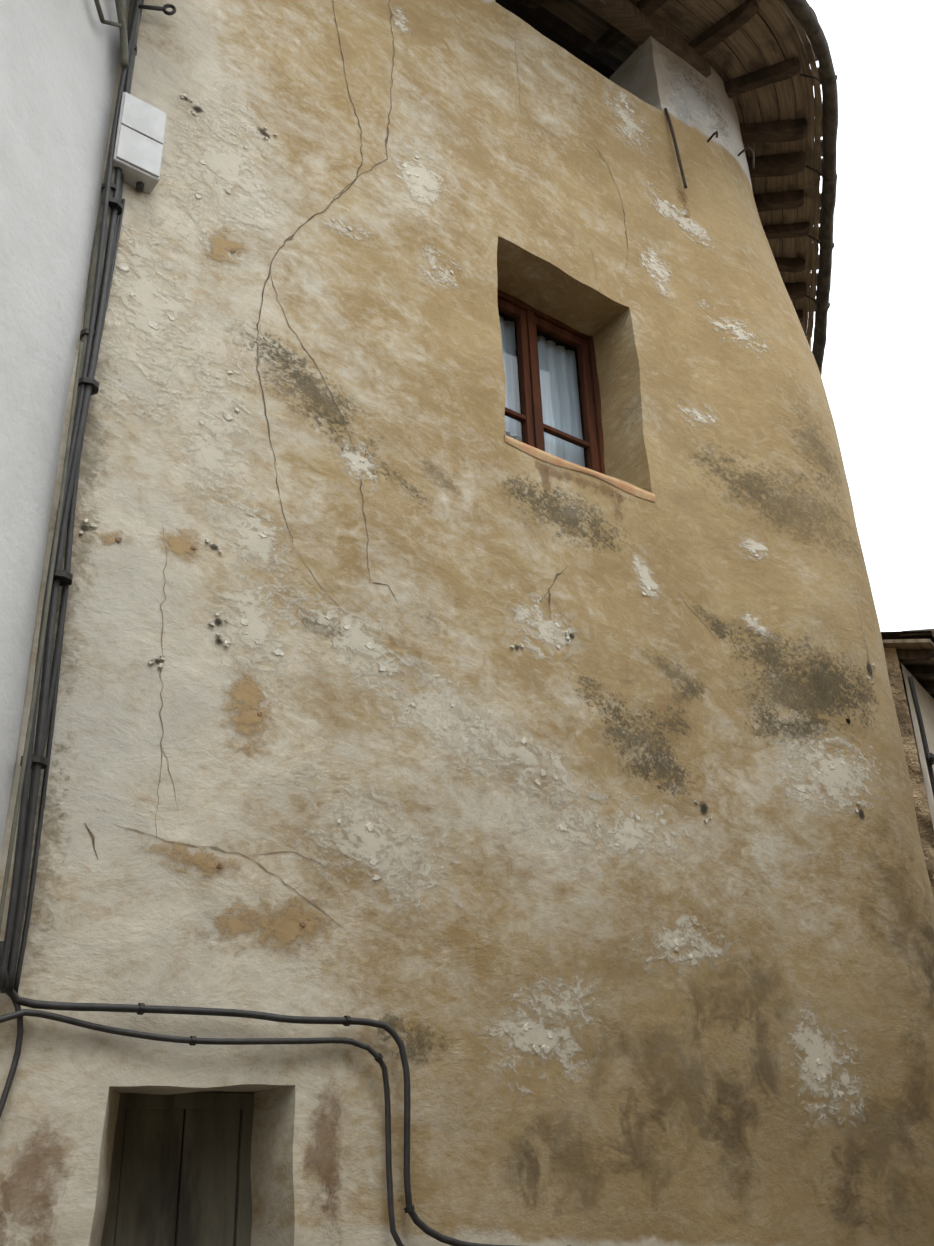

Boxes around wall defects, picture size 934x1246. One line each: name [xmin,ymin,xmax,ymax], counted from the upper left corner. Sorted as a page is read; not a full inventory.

crack [256,0,398,613]
mould [244,341,373,453]
leakage [512,483,618,546]
crack [84,518,356,937]
mould [578,677,690,794]
mould [697,608,877,741]